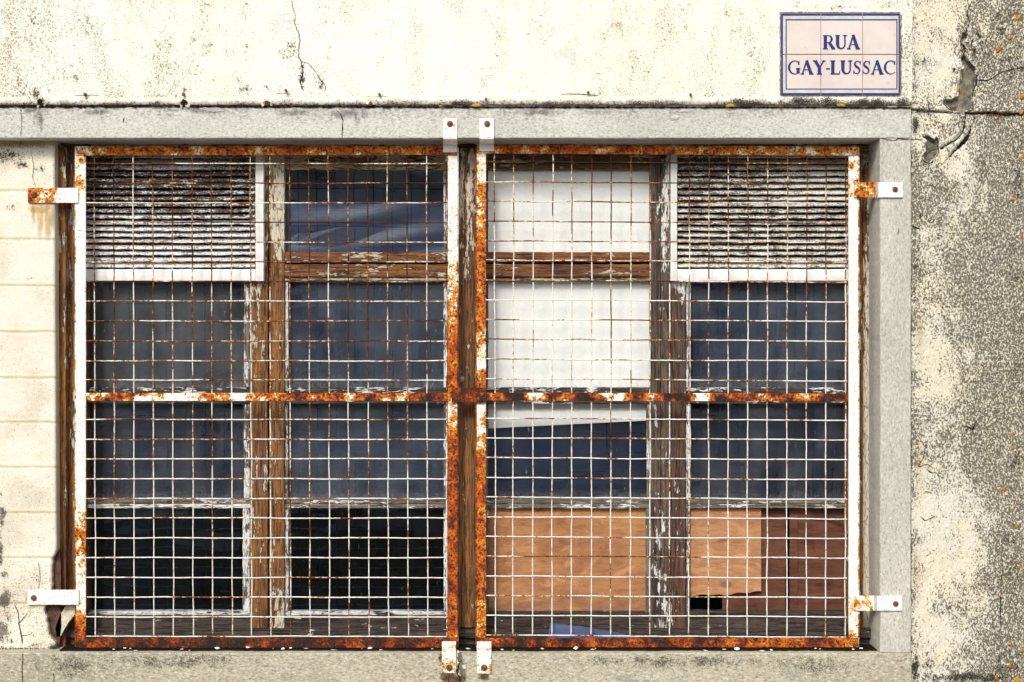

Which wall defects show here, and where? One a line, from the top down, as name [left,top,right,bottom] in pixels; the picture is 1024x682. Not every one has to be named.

crack [0,4,1024,201]
spalling [943,32,981,116]
spalling [921,128,971,164]
water stain [1003,436,1024,608]
water stain [912,646,1024,682]